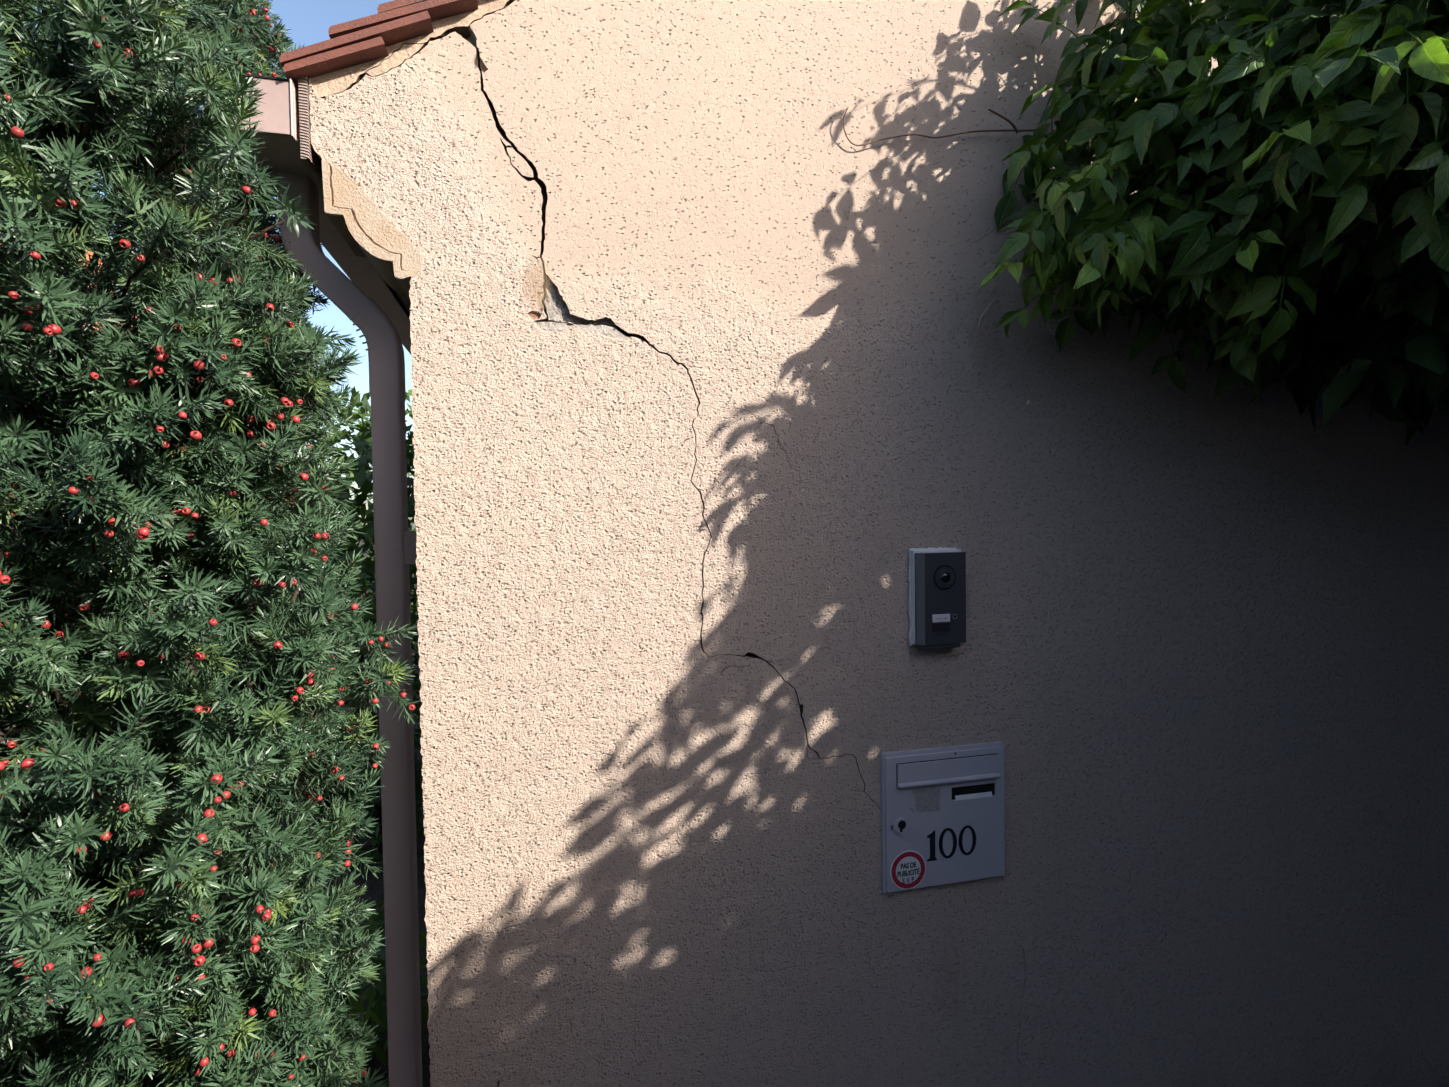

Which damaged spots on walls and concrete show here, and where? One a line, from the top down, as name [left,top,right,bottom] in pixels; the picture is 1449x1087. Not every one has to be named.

spalling [527,274,631,340]
crack [320,0,880,809]